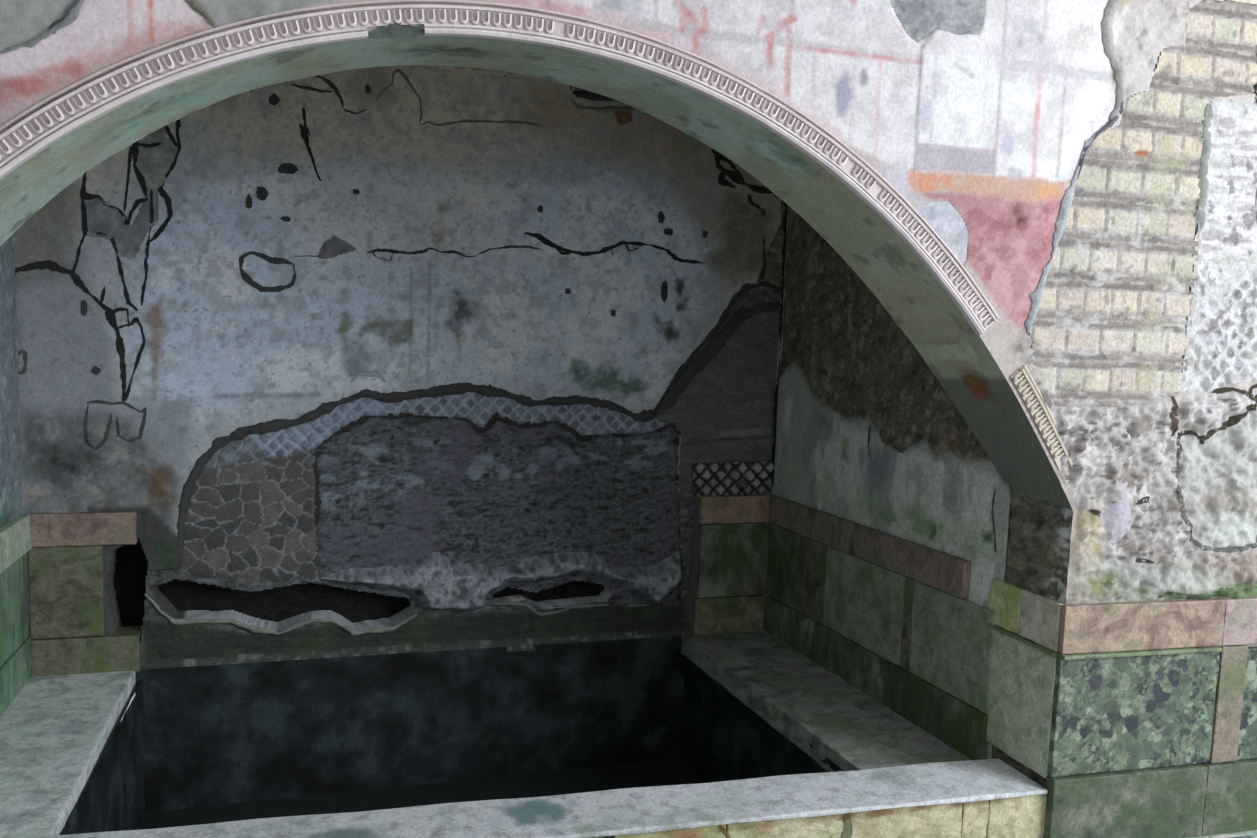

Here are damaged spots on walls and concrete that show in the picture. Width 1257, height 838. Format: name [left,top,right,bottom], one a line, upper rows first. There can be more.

spalling [0,0,84,54]
crack [15,118,181,450]
spalling [245,186,269,209]
spalling [278,163,298,174]
crack [283,69,544,181]
crack [367,232,705,264]
spalling [570,86,639,126]
crack [711,148,788,487]
flaking render [1025,0,1257,408]
spalling [113,194,990,661]
crack [1136,384,1257,553]
crack [1159,586,1257,600]